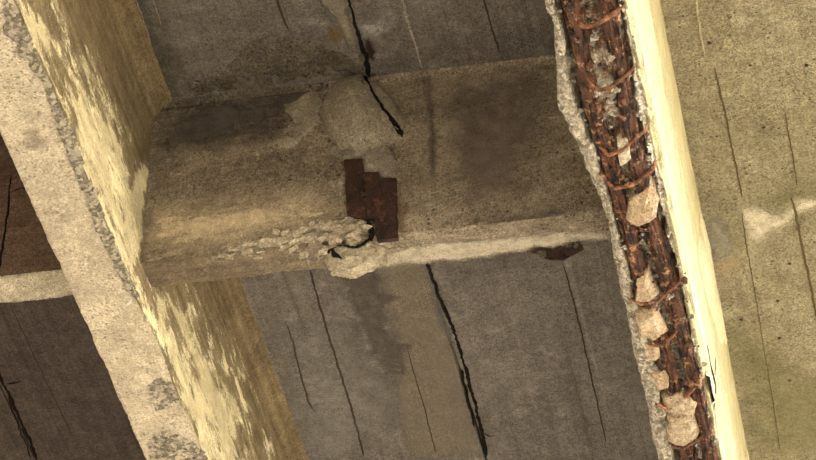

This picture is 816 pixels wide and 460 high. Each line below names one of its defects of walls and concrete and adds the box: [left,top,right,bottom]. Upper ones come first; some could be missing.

crack [348,0,404,138]
crack [401,0,422,68]
peeling [211,216,369,265]
spalling [527,241,584,261]
spalling [545,0,720,460]
crack [695,0,780,460]
leakage [744,199,816,240]
crack [0,373,37,460]
crack [406,345,436,453]
crack [426,261,494,456]